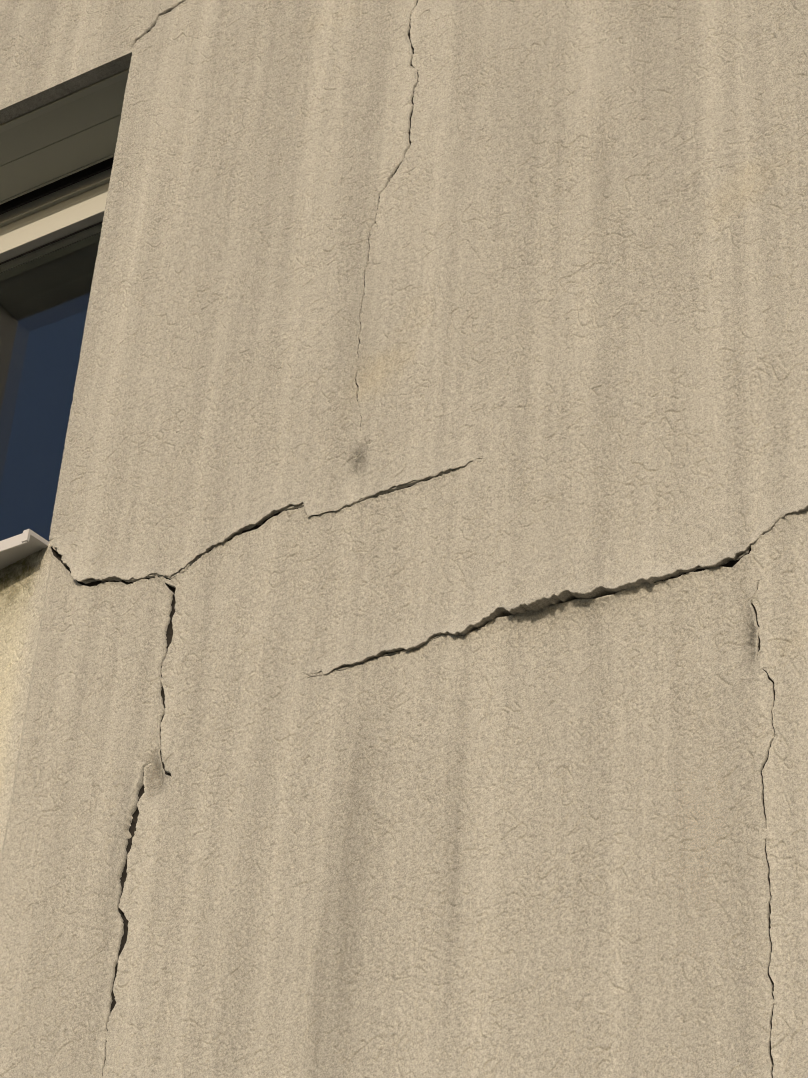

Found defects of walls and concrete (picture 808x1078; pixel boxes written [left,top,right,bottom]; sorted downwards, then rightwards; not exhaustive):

crack [129,0,188,49]
crack [352,0,421,431]
crack [83,575,178,1076]
crack [748,580,779,1078]